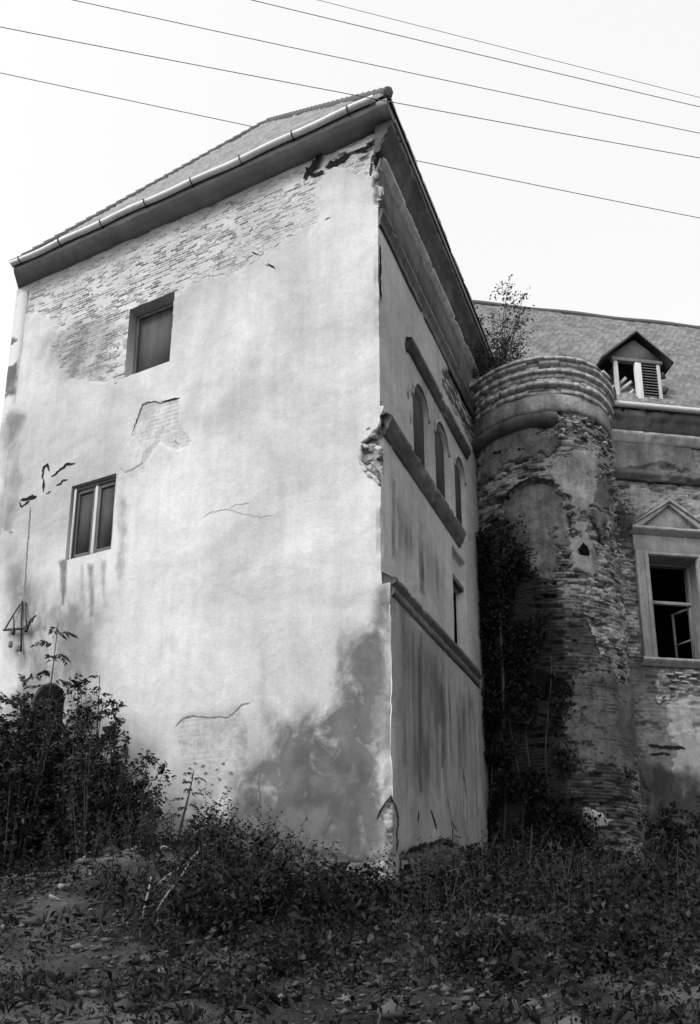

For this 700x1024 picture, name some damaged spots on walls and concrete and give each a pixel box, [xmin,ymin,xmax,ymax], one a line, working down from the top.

flaking render [26,134,384,384]
flaking render [132,397,192,473]
crack [203,503,273,518]
spalling [357,406,385,485]
flaking render [550,410,642,662]
leakage [10,560,97,769]
leakage [231,589,387,883]
flaking render [655,669,700,705]